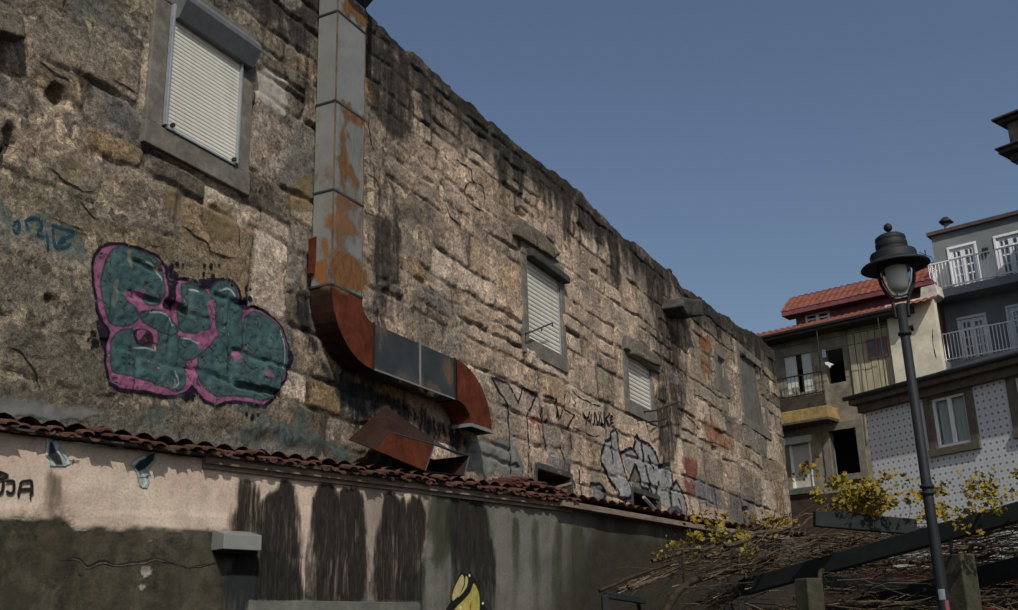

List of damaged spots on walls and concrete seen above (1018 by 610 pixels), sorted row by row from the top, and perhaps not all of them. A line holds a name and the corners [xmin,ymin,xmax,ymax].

damp [365,46,424,138]
rust [306,100,370,294]
damp [371,171,401,329]
damp [223,479,496,610]